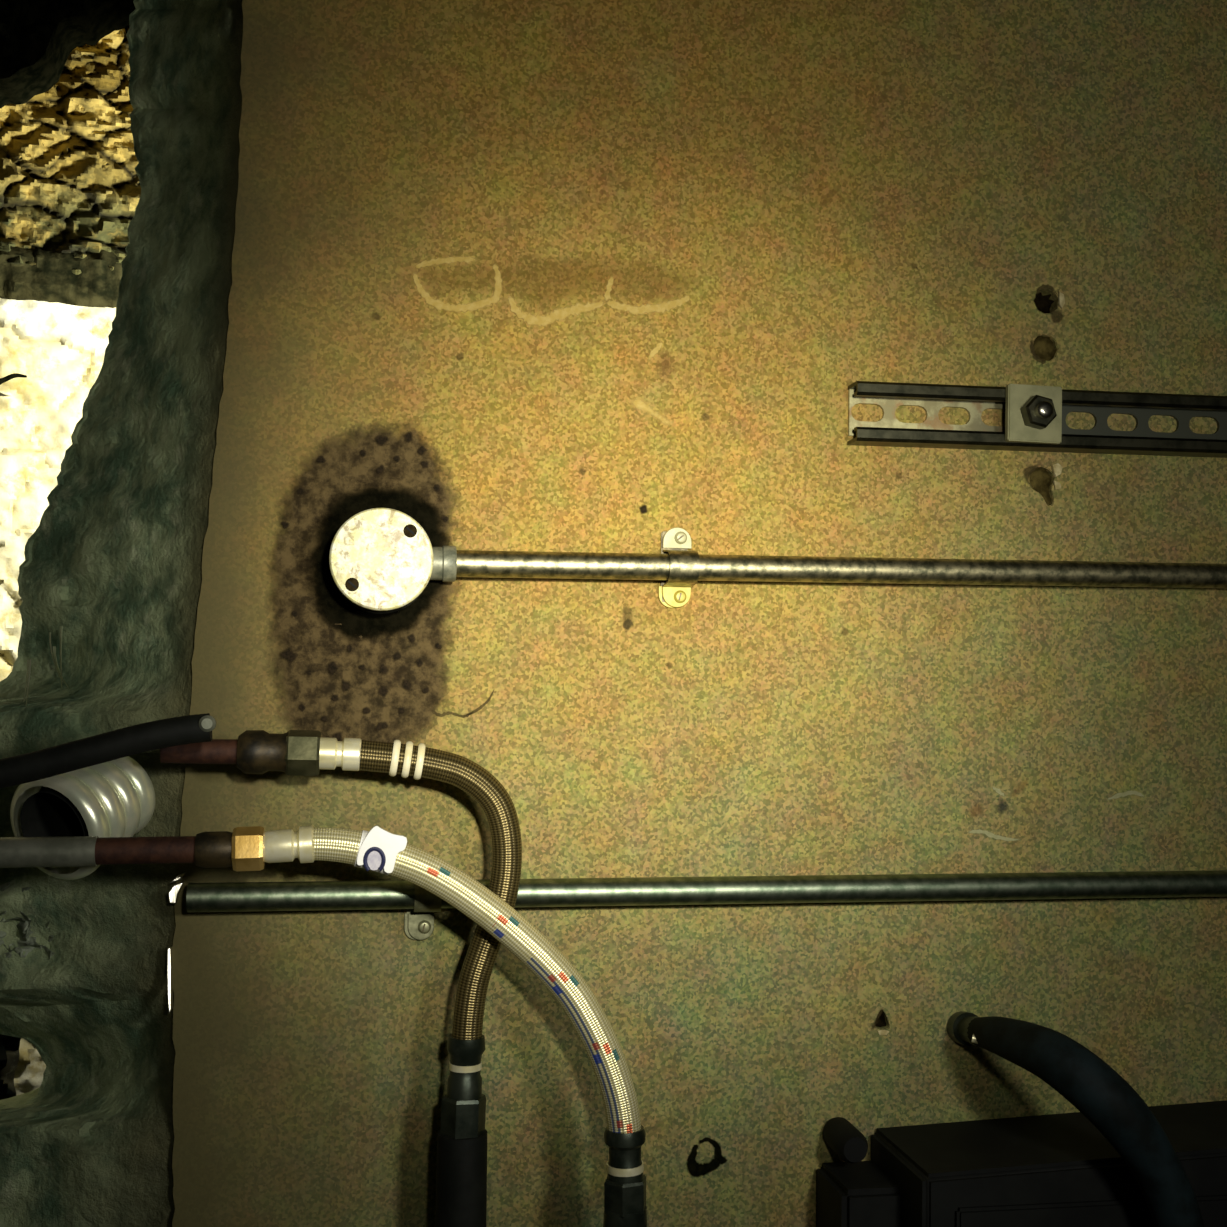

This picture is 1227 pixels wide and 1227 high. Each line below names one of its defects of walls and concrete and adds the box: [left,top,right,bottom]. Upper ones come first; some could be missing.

leakage [413,257,690,326]